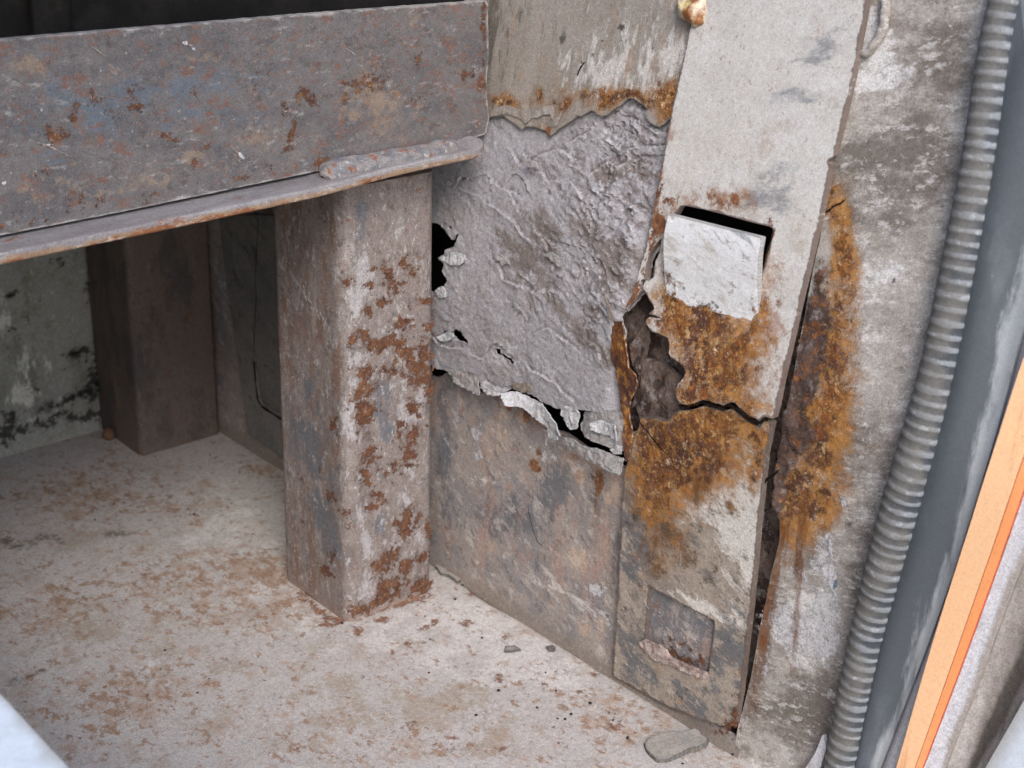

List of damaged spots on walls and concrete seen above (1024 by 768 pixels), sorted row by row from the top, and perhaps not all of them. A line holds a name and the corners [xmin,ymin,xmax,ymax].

corrosion [37,83,144,148]
corrosion [280,86,324,154]
corrosion [342,62,391,105]
corrosion [450,2,524,108]
corrosion [536,76,679,122]
peeling [430,98,670,475]
corrosion [296,252,435,636]
corrosion [626,166,781,577]
crack [678,401,768,425]
corrosion [754,185,862,675]